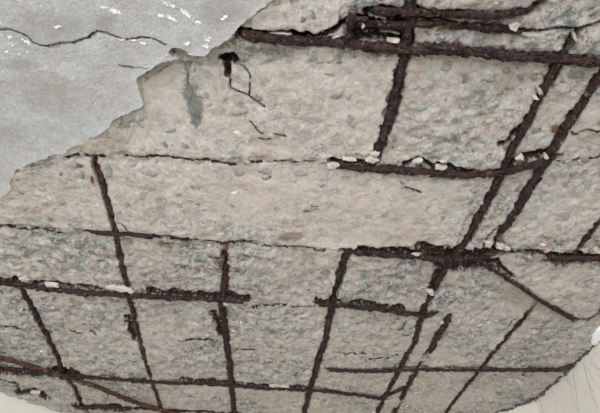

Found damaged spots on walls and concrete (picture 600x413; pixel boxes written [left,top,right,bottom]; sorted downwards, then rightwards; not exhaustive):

crack [3,27,165,48]
spalling [0,30,551,389]
spalling [237,0,600,413]
spalling [0,280,250,413]
spalling [64,371,418,413]